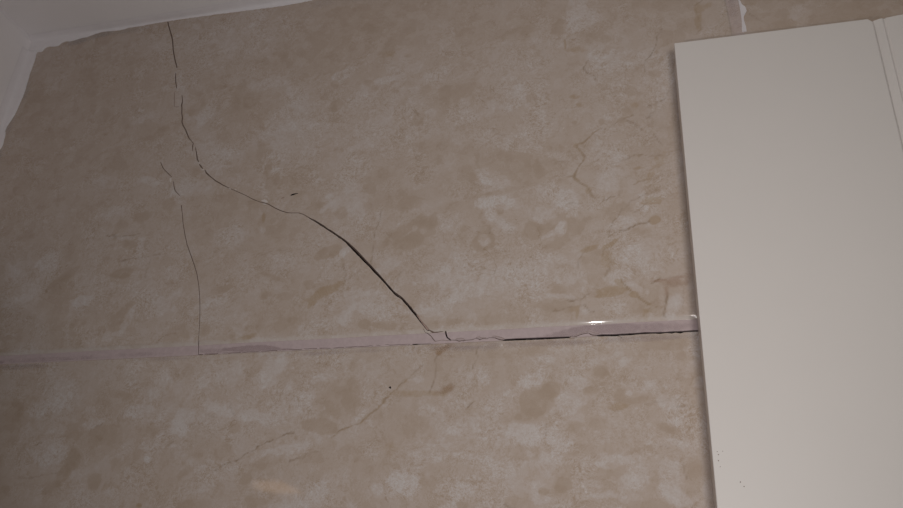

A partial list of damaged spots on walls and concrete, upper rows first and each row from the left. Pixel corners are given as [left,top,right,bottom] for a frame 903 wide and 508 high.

crack [161,22,698,355]